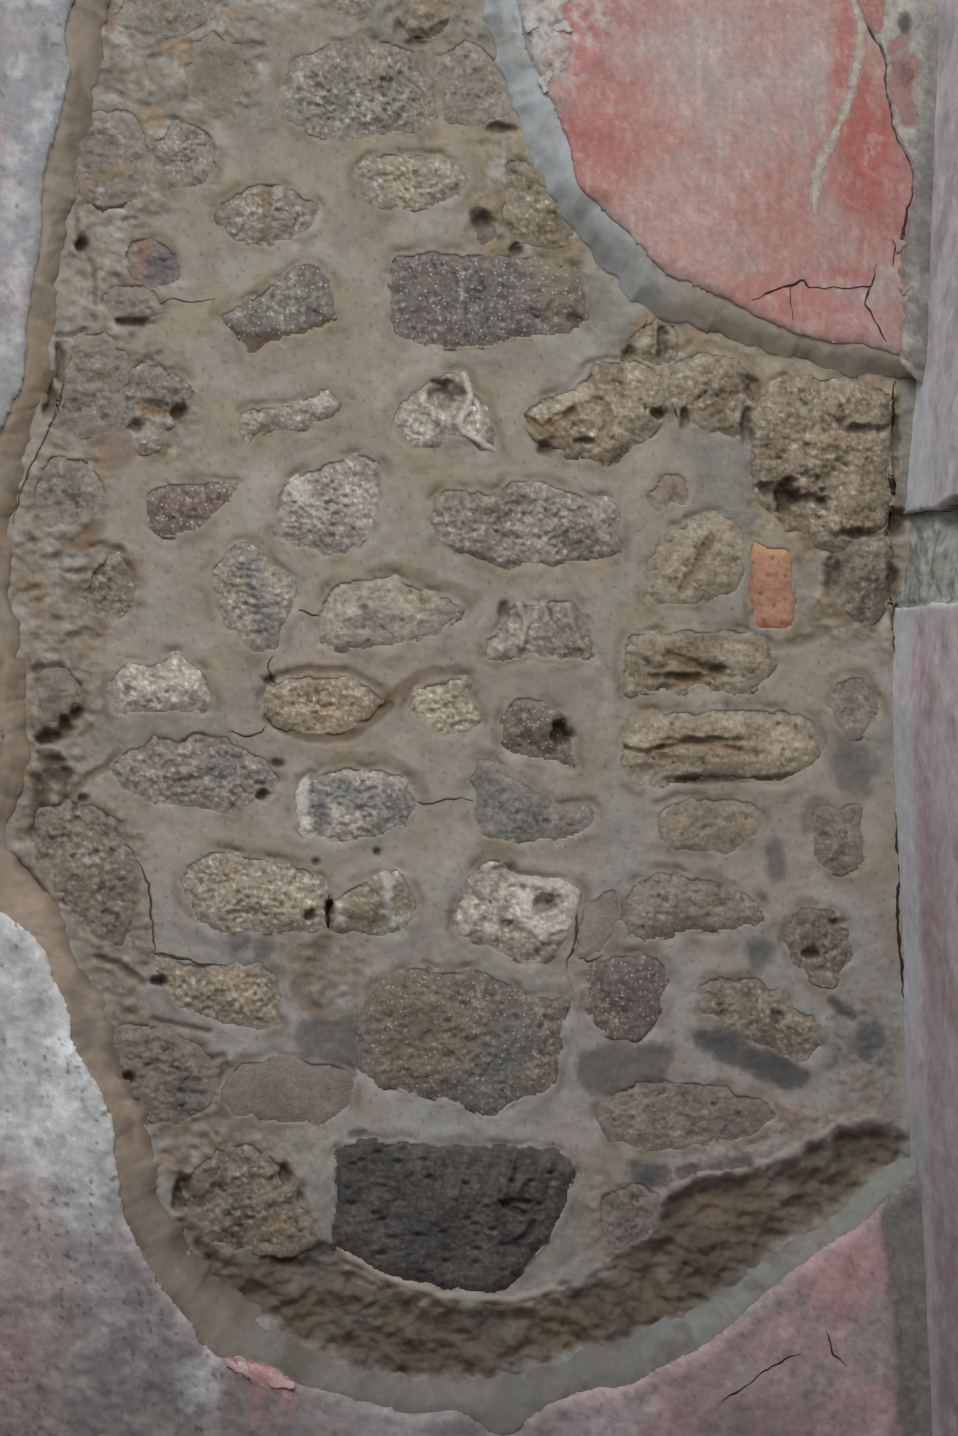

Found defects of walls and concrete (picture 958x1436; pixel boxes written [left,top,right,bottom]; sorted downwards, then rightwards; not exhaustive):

spalling [482,0,916,379]
crack [753,3,914,341]
peeling [858,0,939,383]
spalling [896,501,958,608]
peeling [224,1356,295,1400]
crack [722,1331,846,1401]
peeling [881,1171,932,1436]